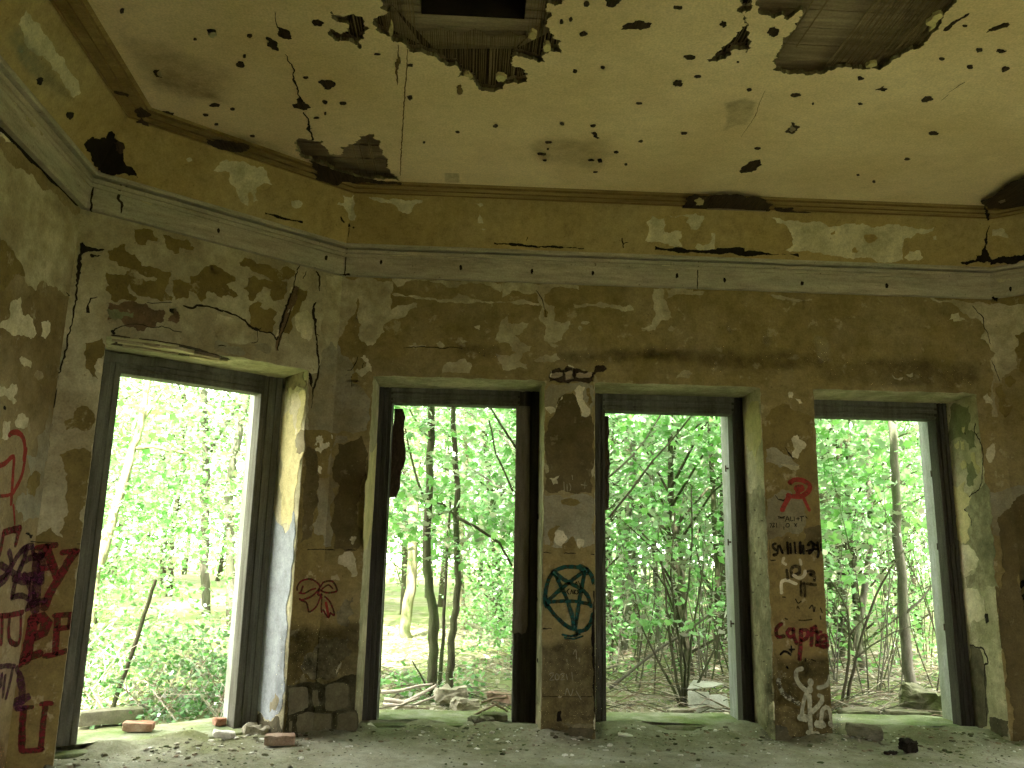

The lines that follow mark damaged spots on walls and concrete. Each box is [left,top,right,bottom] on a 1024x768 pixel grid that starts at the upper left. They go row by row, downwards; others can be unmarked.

flaking render [312,0,573,95]
flaking render [683,0,969,80]
crack [285,54,314,141]
flaking render [84,131,138,178]
flaking render [294,134,402,221]
peeling [646,194,937,263]
crack [960,206,1024,265]
crack [53,243,97,408]
crack [111,217,355,408]
peeling [930,297,1024,417]
peeling [279,275,607,547]
flaking render [948,403,1024,737]